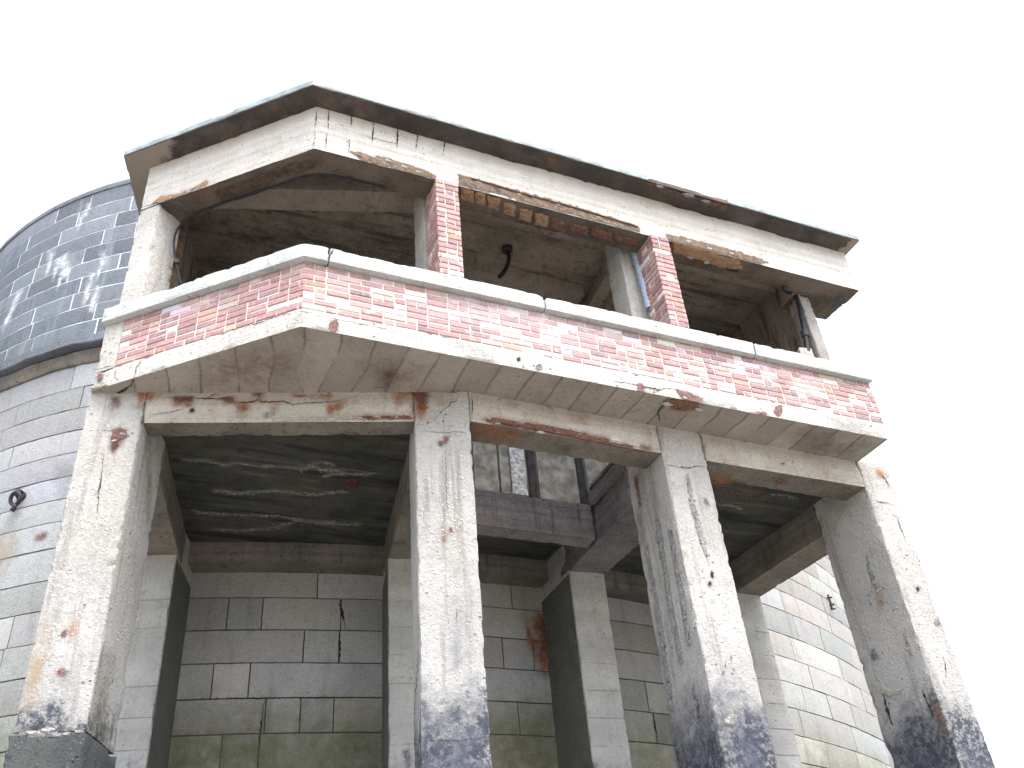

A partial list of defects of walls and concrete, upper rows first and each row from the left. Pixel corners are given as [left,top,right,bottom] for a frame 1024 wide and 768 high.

spalling [152,161,315,204]
spalling [350,151,436,179]
spalling [458,174,640,232]
spalling [666,234,768,272]
crack [149,385,386,415]
crack [337,600,345,662]